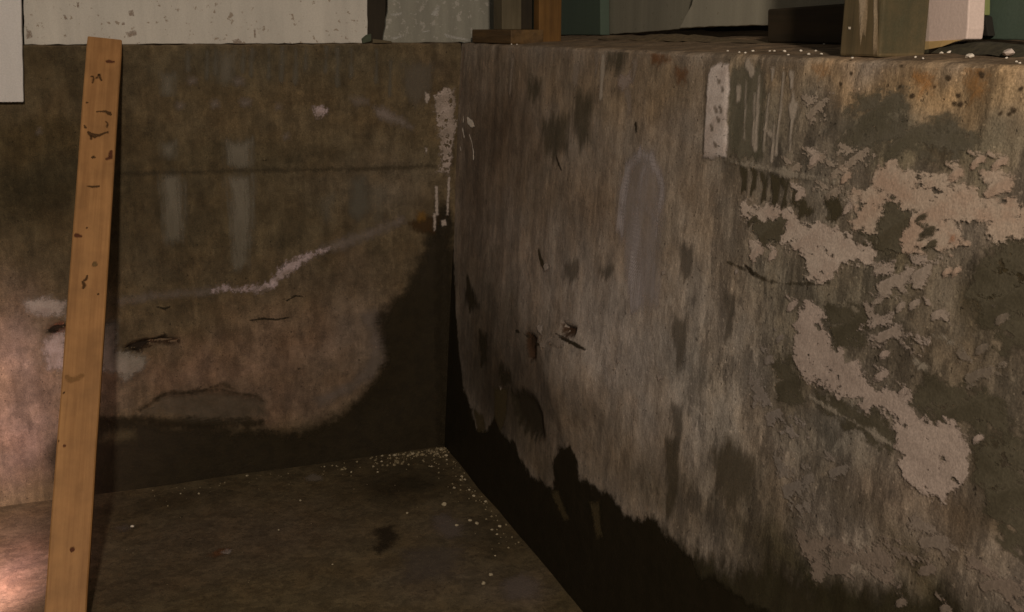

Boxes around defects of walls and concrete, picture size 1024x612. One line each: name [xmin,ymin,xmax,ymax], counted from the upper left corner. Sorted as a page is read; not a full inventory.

peeling [703,62,730,159]
peeling [801,72,853,125]
crack [727,262,825,285]
spalling [739,142,1024,561]
water stain [95,205,958,612]